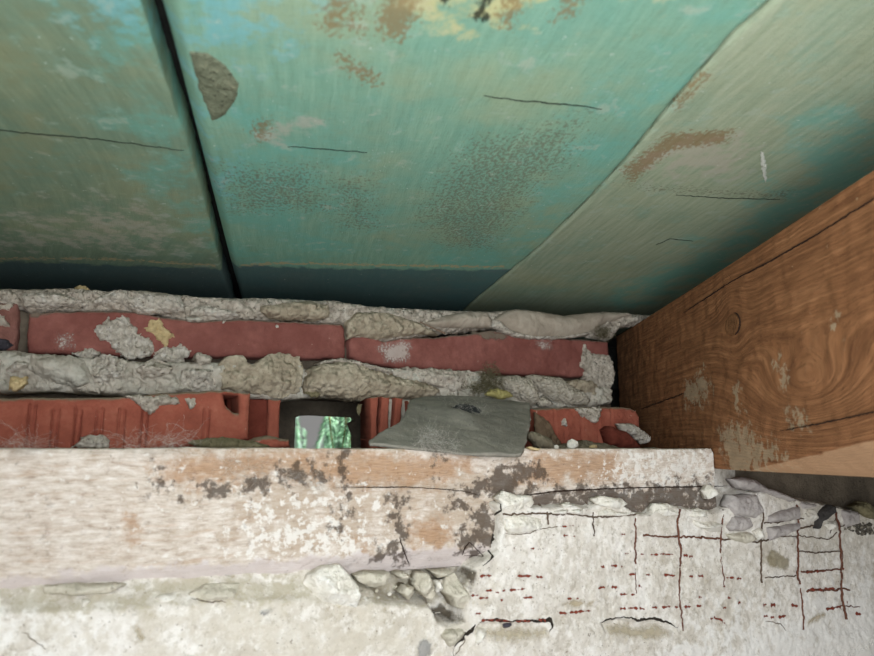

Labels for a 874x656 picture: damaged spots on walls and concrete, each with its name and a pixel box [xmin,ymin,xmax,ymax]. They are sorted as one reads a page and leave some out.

crack [0,130,184,151]
spalling [458,567,476,583]
spalling [479,617,554,639]
spalling [601,616,678,639]
crack [453,624,476,655]